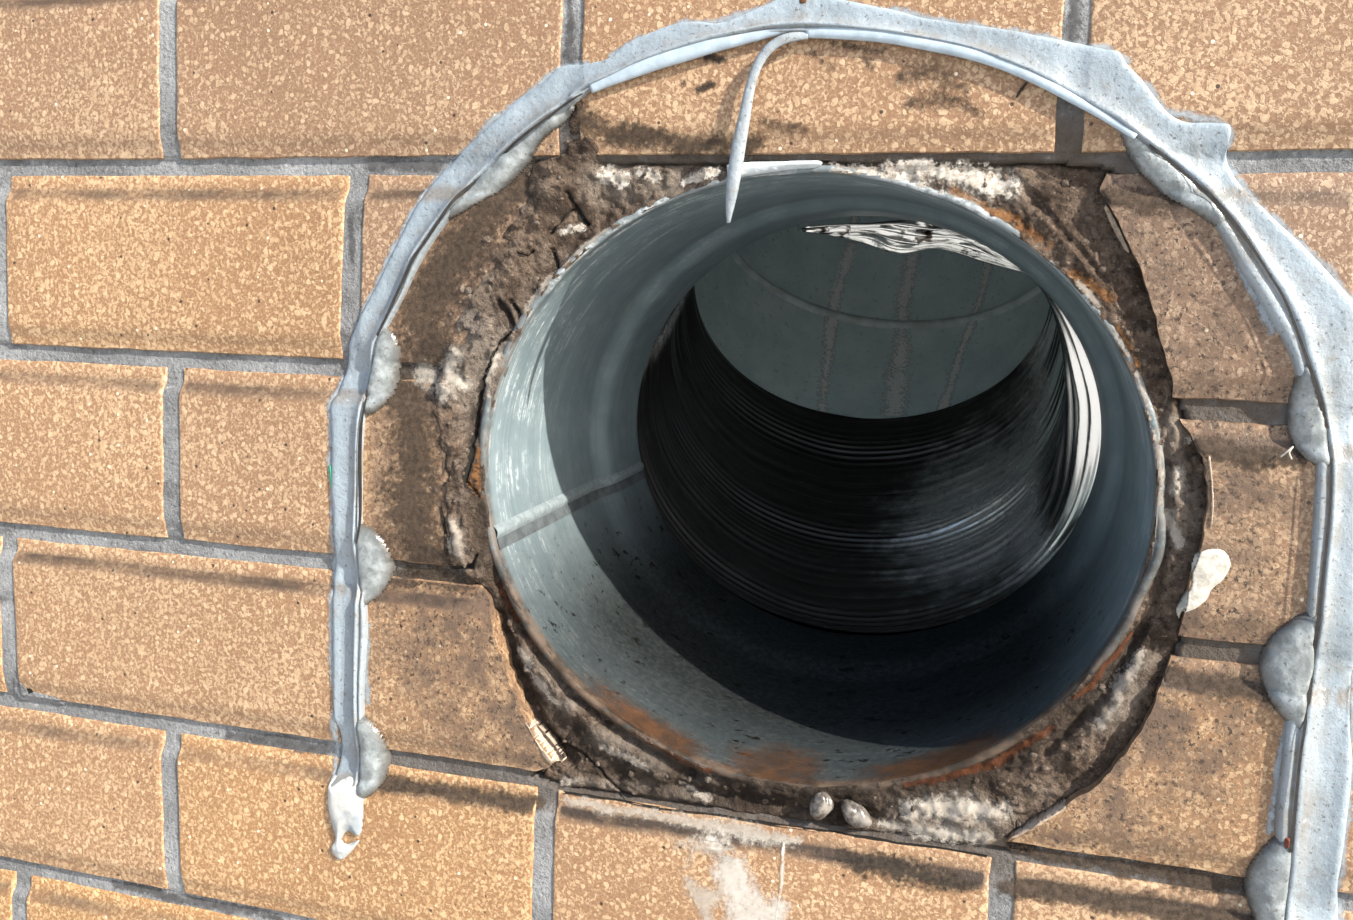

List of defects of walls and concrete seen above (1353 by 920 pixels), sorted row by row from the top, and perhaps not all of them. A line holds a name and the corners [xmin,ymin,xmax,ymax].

rust [497,581,520,623]
rust [1073,632,1134,700]
rust [595,686,712,774]
rust [871,725,1055,788]
leakage [569,798,801,920]